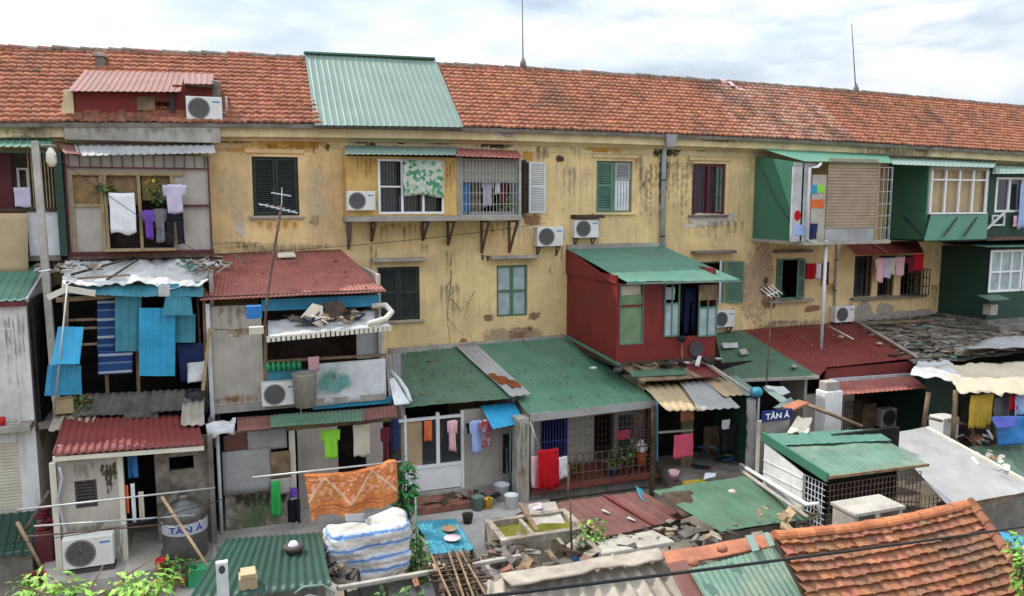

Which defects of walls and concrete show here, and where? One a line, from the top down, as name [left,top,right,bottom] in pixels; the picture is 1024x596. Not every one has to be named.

damp [639,149,693,217]
crack [445,271,475,340]
peeling [854,300,937,322]
peeling [484,312,541,340]
corrosion [488,373,522,387]